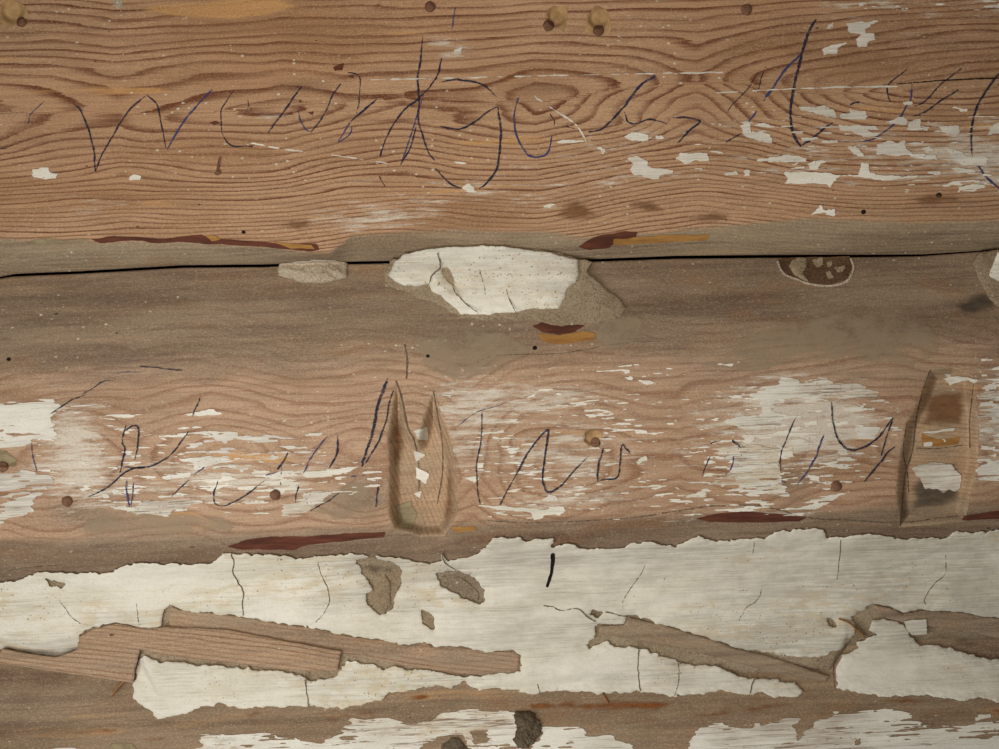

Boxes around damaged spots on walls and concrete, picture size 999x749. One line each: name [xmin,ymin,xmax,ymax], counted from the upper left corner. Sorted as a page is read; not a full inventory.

peeling [822,20,878,55]
peeling [627,144,724,179]
peeling [724,105,999,192]
peeling [944,359,999,481]
peeling [0,399,382,524]
peeling [465,364,902,520]
peeling [912,462,961,493]
flaking render [357,557,402,615]
flaking render [436,571,485,604]
flaking render [422,609,434,629]
peeling [196,709,633,749]
peeling [688,709,999,749]